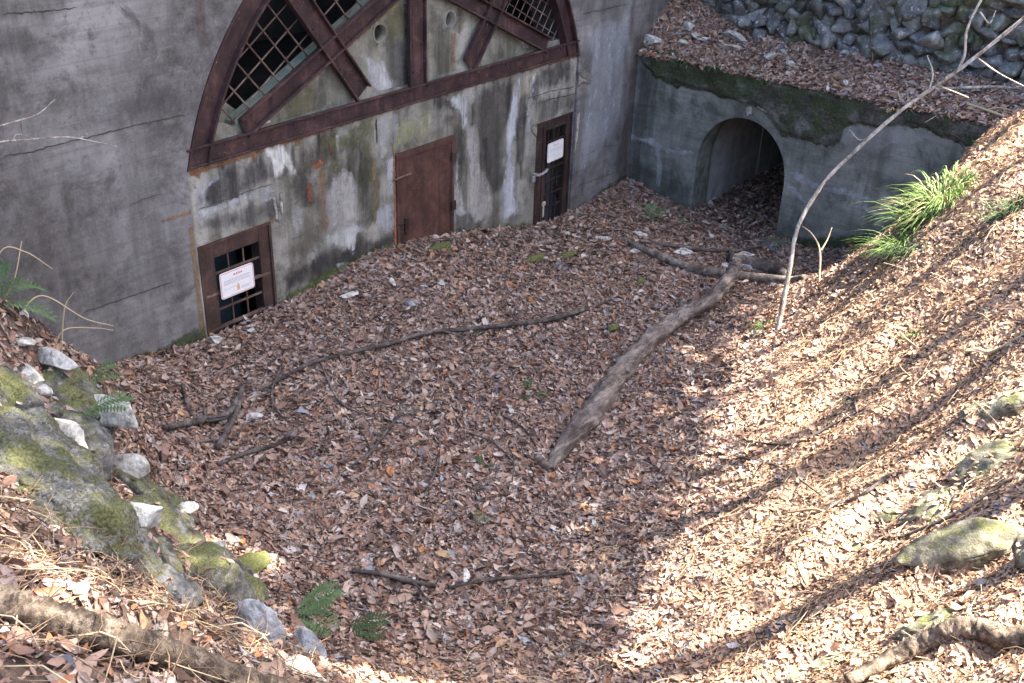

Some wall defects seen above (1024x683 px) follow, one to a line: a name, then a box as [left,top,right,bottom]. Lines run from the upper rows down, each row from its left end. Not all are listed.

crack [2,7,76,15]
crack [1,114,187,159]
corrosion [189,122,353,178]
leakage [397,62,569,228]
leakage [199,135,394,290]
crack [82,281,174,314]